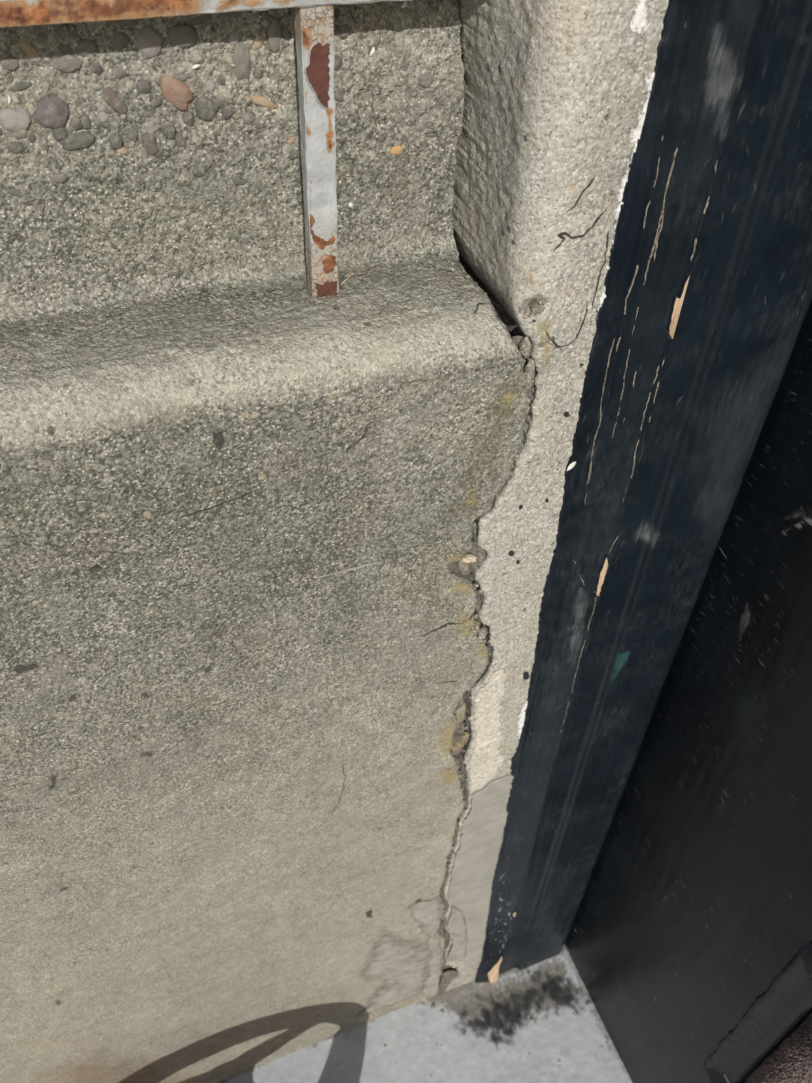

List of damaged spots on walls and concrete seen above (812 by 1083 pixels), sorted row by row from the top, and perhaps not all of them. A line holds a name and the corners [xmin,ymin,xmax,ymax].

rust [0,0,200,27]
rust [216,0,259,13]
rust [302,26,335,152]
rust [310,214,339,298]
crack [475,174,609,415]
crack [419,519,496,992]